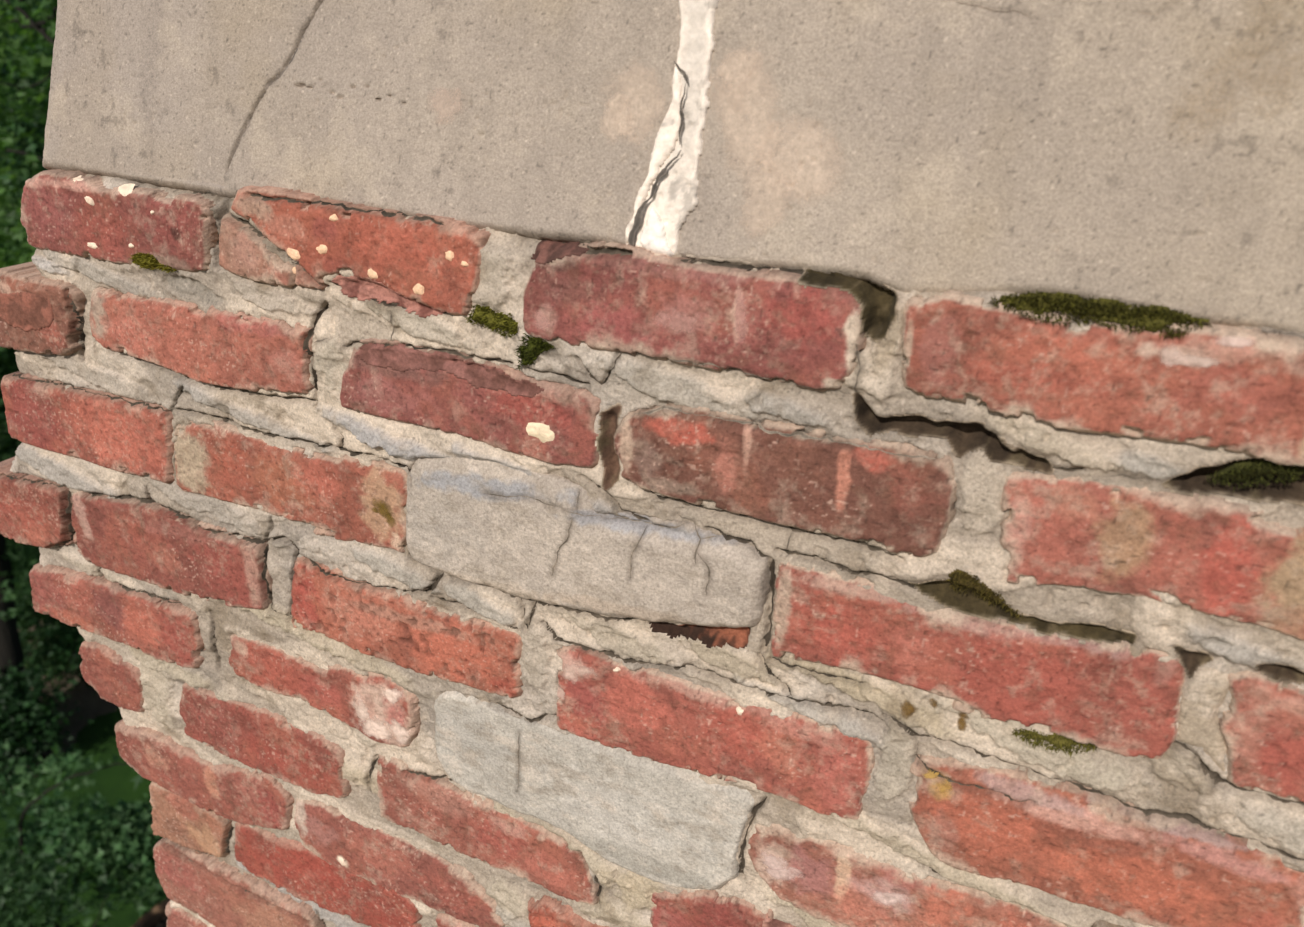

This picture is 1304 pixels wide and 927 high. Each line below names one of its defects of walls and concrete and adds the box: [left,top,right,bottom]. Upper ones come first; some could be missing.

crack [231,18,314,159]
crack [625,0,719,257]
crack [1261,328,1304,339]
crack [3,474,1304,862]